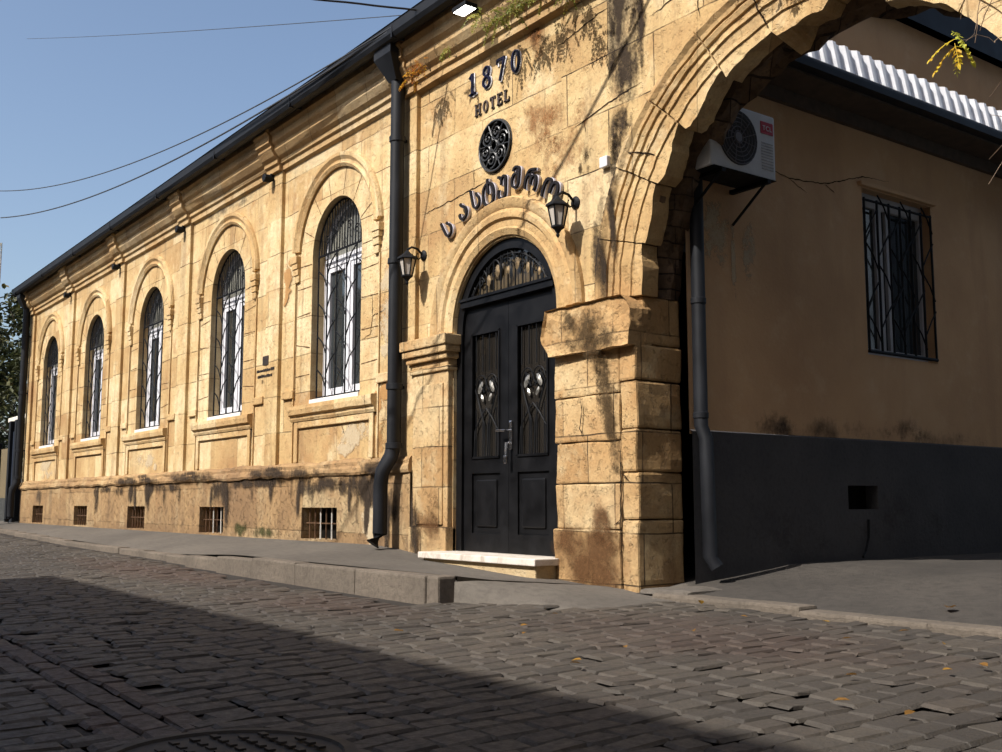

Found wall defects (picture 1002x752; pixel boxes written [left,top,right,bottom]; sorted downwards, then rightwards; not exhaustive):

damp [608,0,645,97]
damp [593,111,631,296]
damp [595,350,619,470]
damp [94,462,397,547]
damp [410,492,438,554]
damp [556,507,617,588]